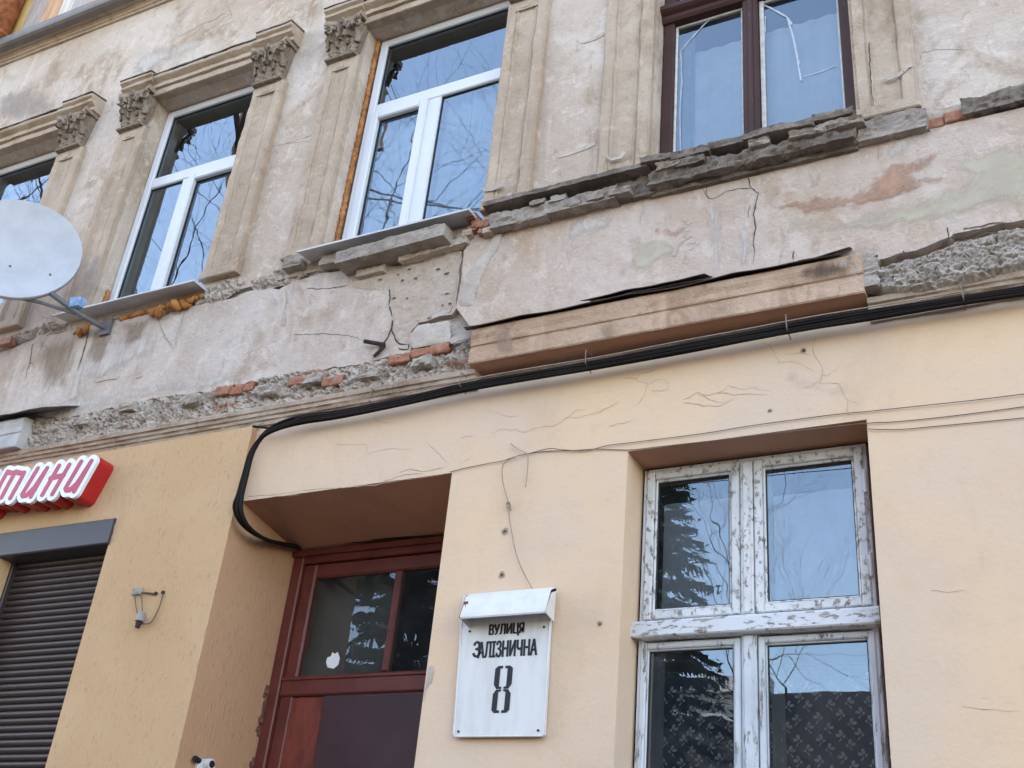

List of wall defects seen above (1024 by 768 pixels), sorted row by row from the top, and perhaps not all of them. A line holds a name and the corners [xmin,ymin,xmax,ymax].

peeling [639,105,867,172]
flaking render [927,104,973,130]
crack [704,177,759,263]
spalling [853,227,1024,297]
spalling [27,212,495,448]
crack [294,289,409,357]
crack [492,370,766,434]